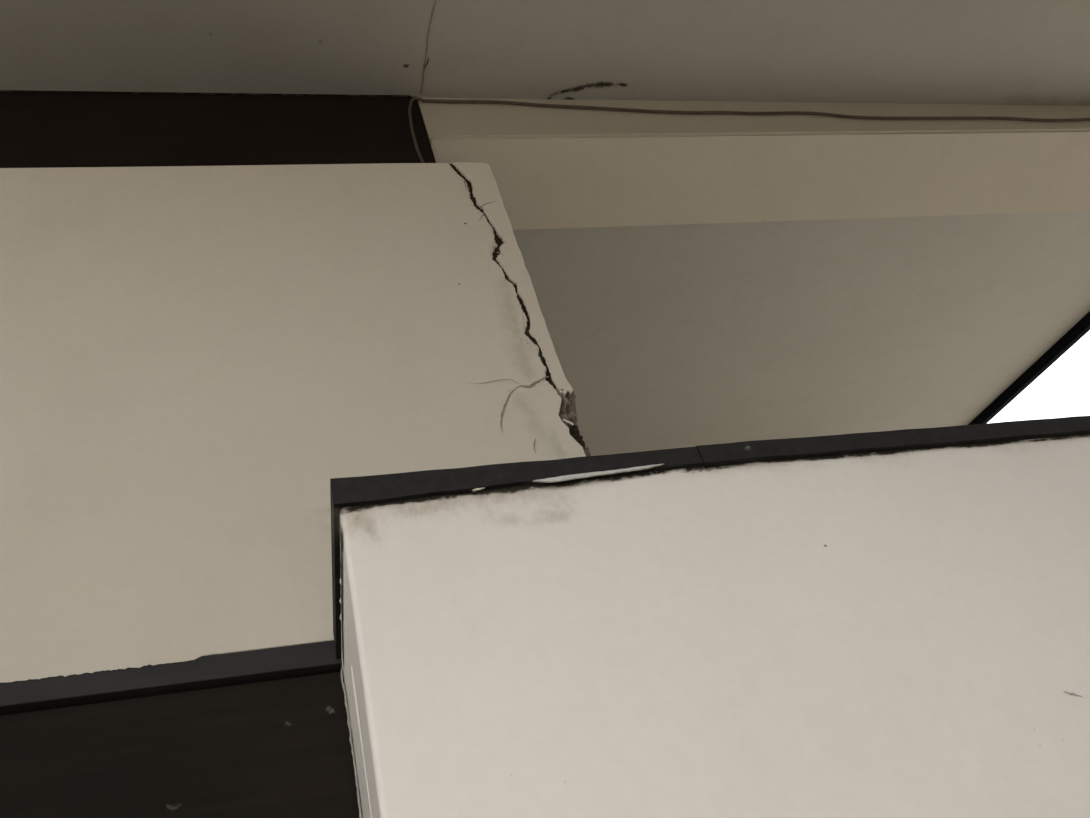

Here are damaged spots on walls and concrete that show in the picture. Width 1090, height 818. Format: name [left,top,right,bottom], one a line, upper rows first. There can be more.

crack [420,0,436,94]
crack [449,164,560,430]
spalling [452,162,591,456]